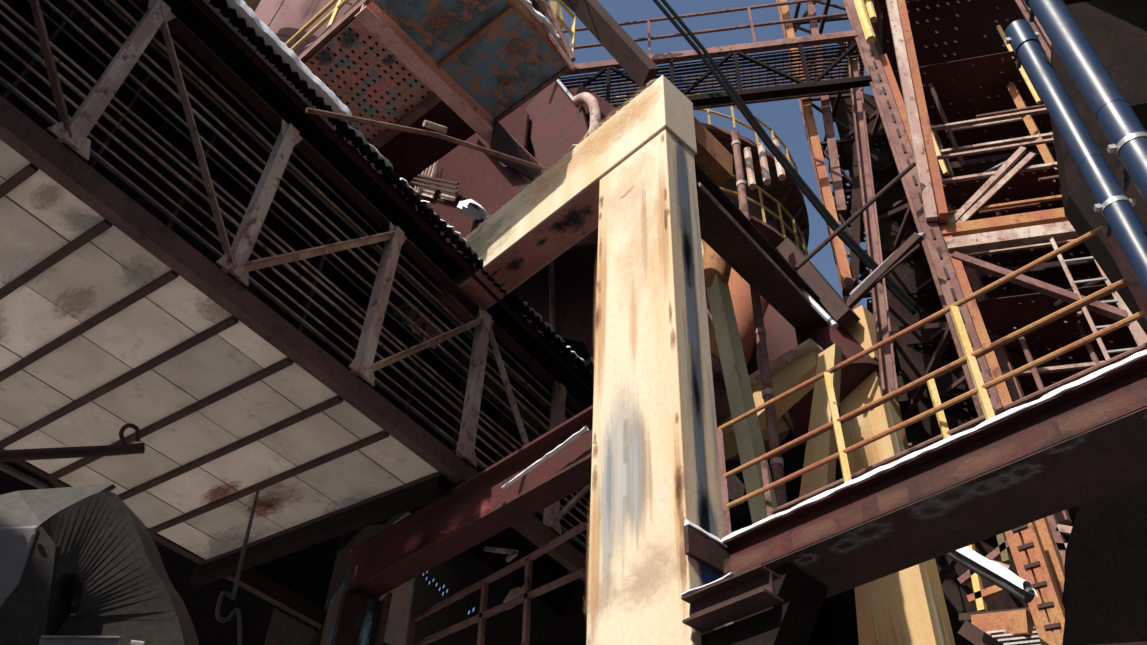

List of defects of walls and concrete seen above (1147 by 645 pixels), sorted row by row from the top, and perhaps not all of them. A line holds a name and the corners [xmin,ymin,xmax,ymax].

damp [603,405,642,576]